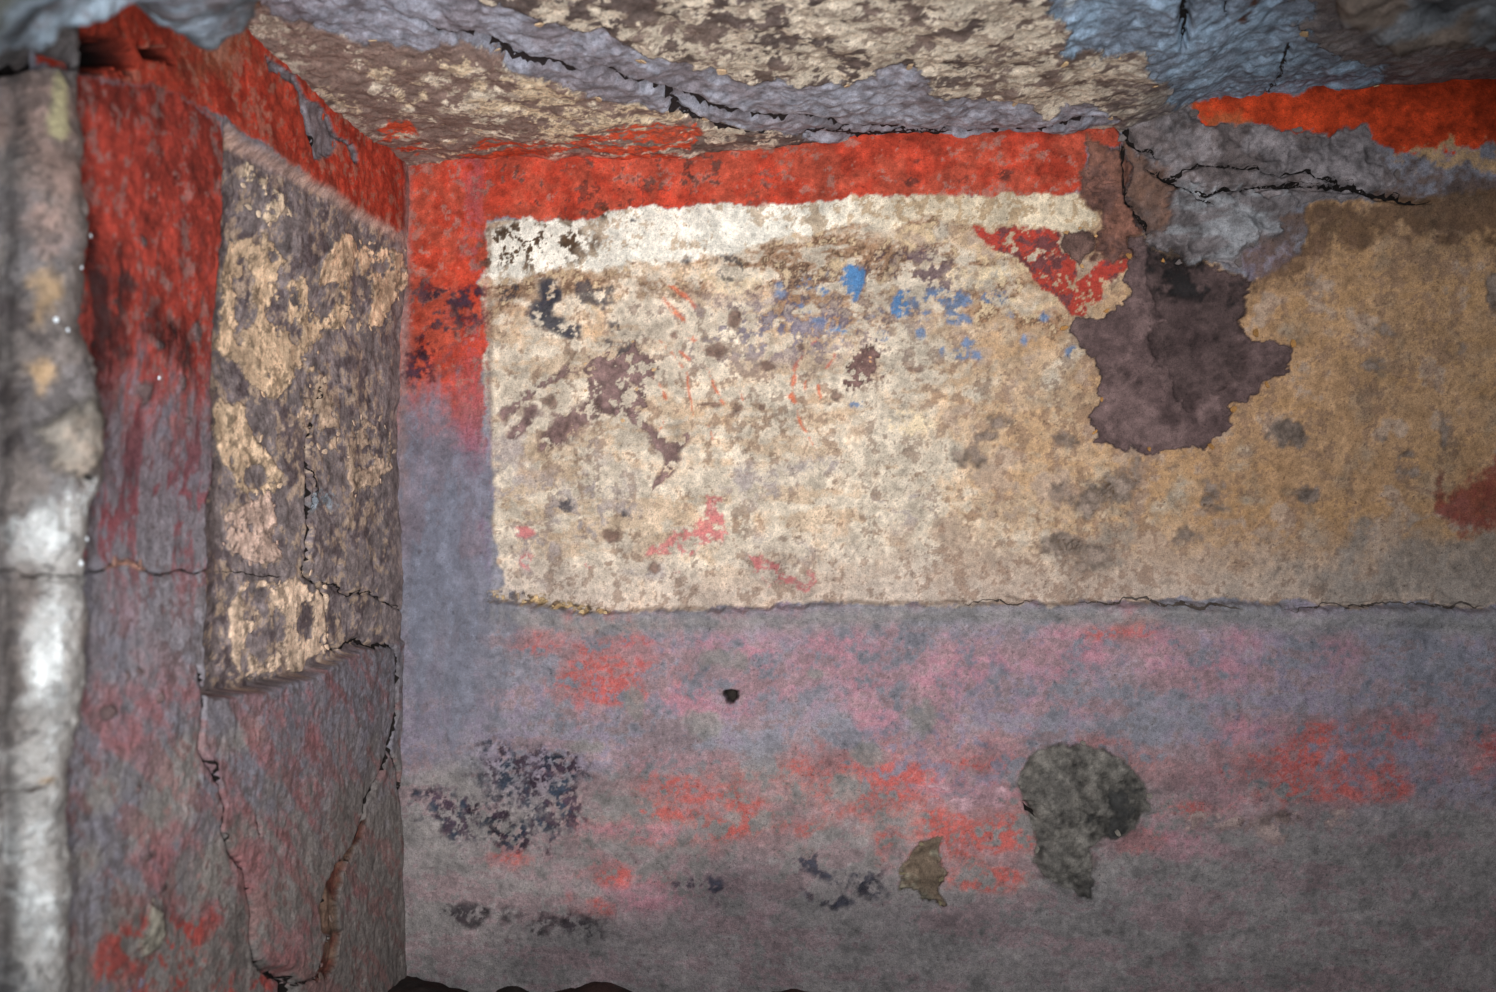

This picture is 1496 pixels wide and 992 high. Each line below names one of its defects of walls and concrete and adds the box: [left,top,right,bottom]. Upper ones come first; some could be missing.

crack [0,386,401,866]
peeling [213,398,329,679]
peeling [213,161,409,497]
leakage [404,410,581,849]
peeling [500,340,690,490]
spalling [258,0,1401,455]
peeling [953,417,1010,468]
peeling [1052,475,1133,519]
peeling [1296,487,1318,504]
crack [201,759,313,992]
spalling [899,836,948,907]